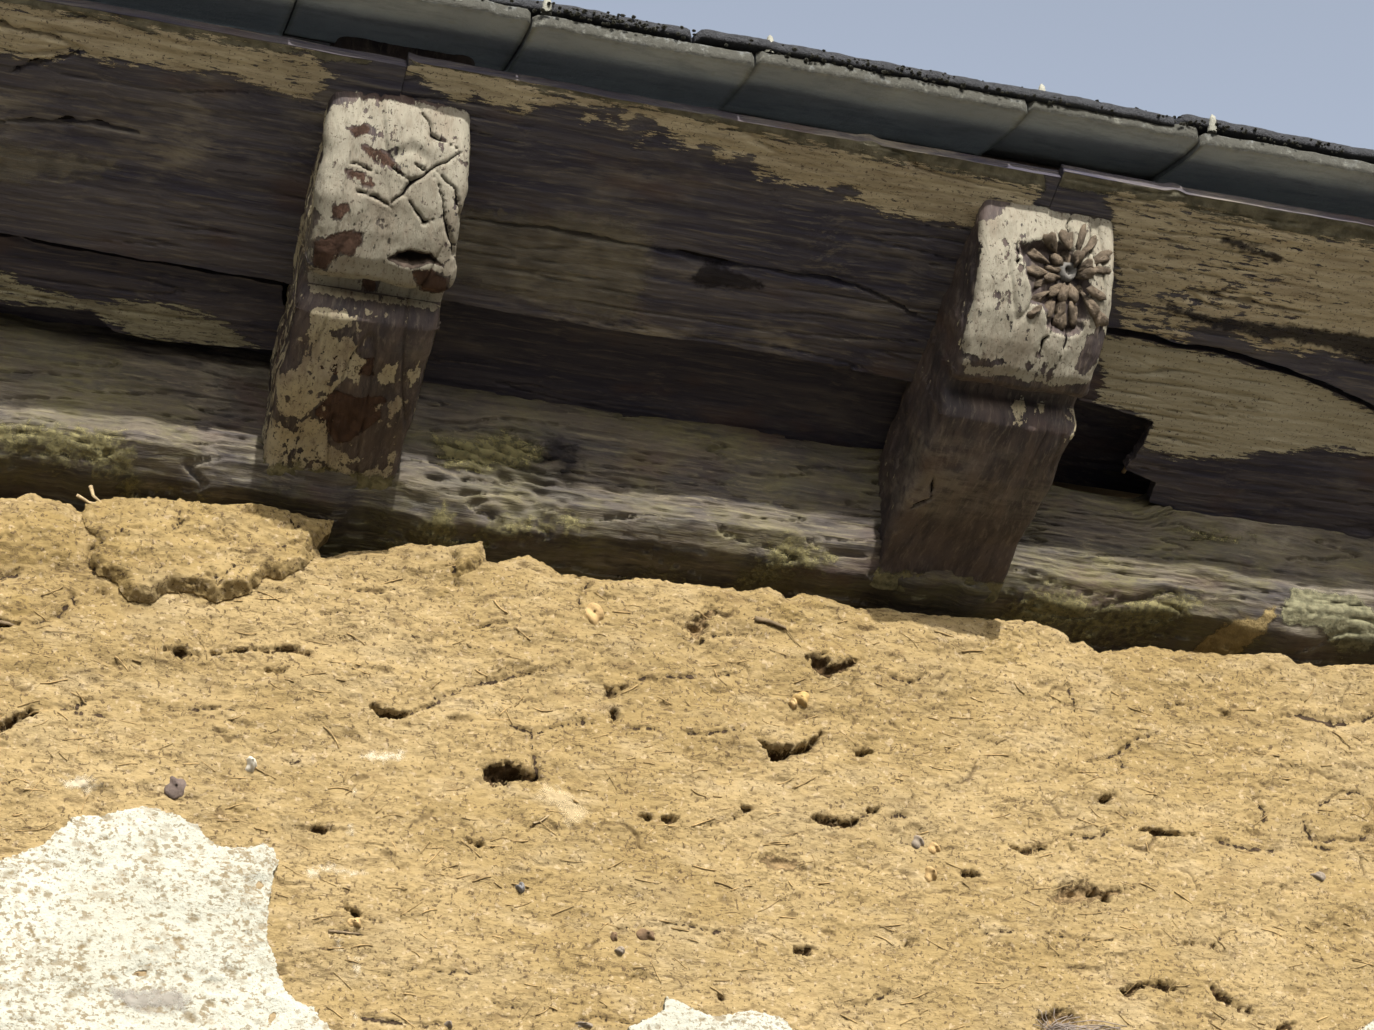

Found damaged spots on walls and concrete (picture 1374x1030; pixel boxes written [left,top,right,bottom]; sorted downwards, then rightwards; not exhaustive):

crack [353,116,458,251]
peeling [0,2,1374,479]
spalling [682,610,716,640]
spalling [211,648,310,657]
spalling [807,653,856,679]
spalling [0,714,34,732]
spalling [762,744,815,762]
spalling [483,763,534,788]
spalling [814,810,876,828]
spalling [1053,881,1121,904]
spalling [1120,983,1170,997]
spalling [1210,987,1250,1014]